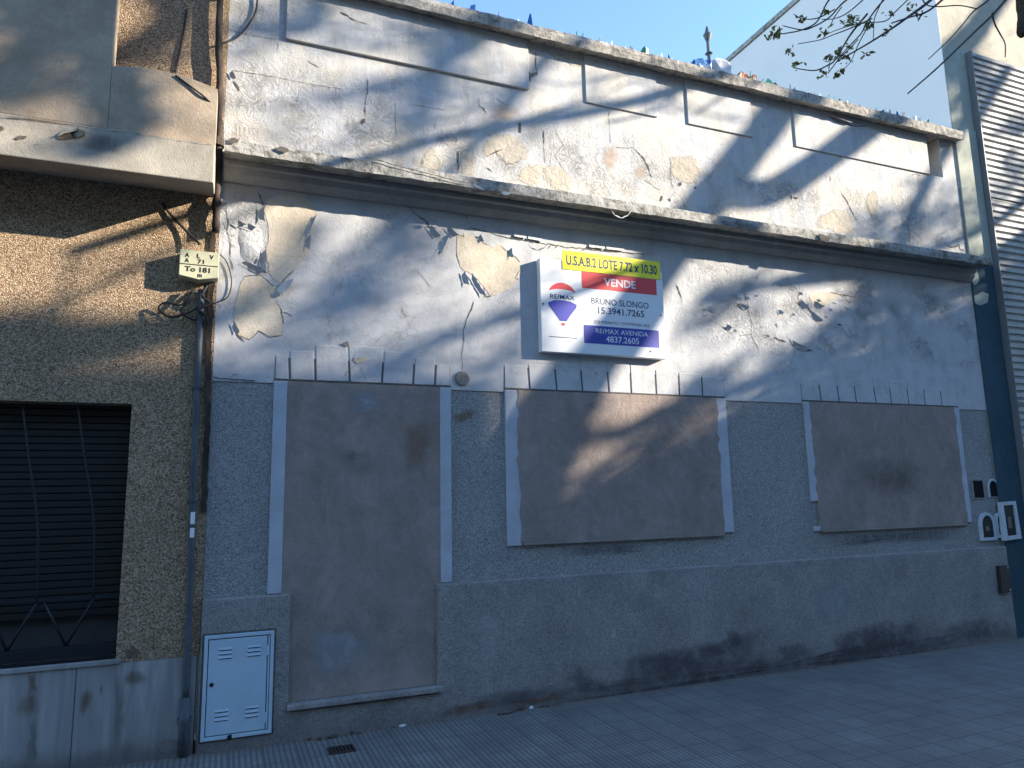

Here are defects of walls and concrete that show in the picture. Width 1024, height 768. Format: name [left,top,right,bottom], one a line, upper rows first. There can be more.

peeling [457,122,572,191]
peeling [669,156,701,189]
peeling [815,209,854,242]
peeling [232,192,318,341]
peeling [447,226,521,297]